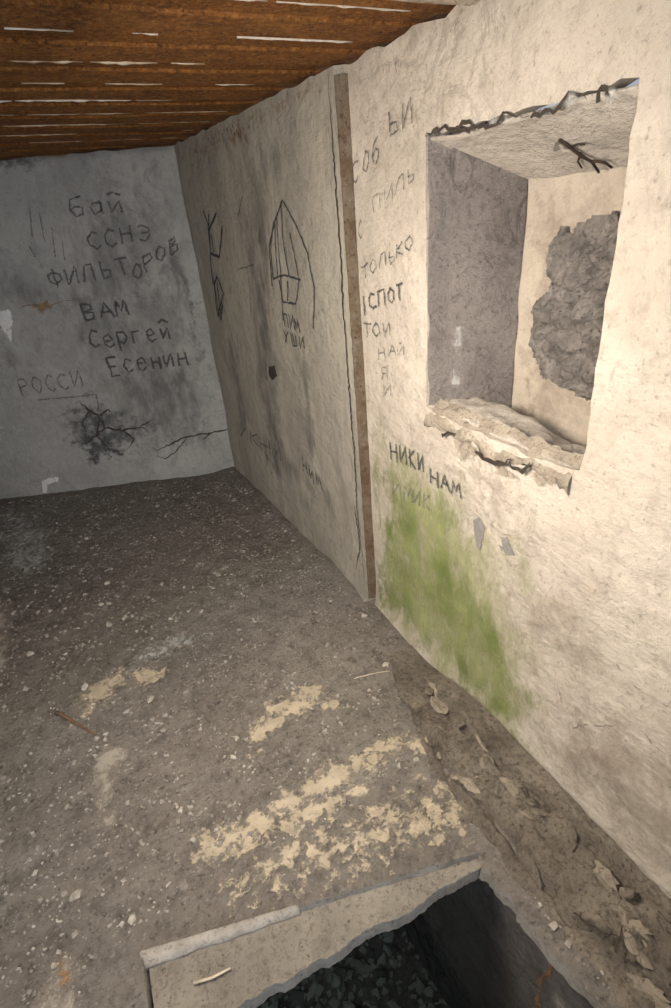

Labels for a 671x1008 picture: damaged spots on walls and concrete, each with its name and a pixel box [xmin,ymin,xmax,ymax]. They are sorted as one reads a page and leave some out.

flaking render [425,84,609,137]
crack [78,403,228,459]
flaking render [424,399,584,496]